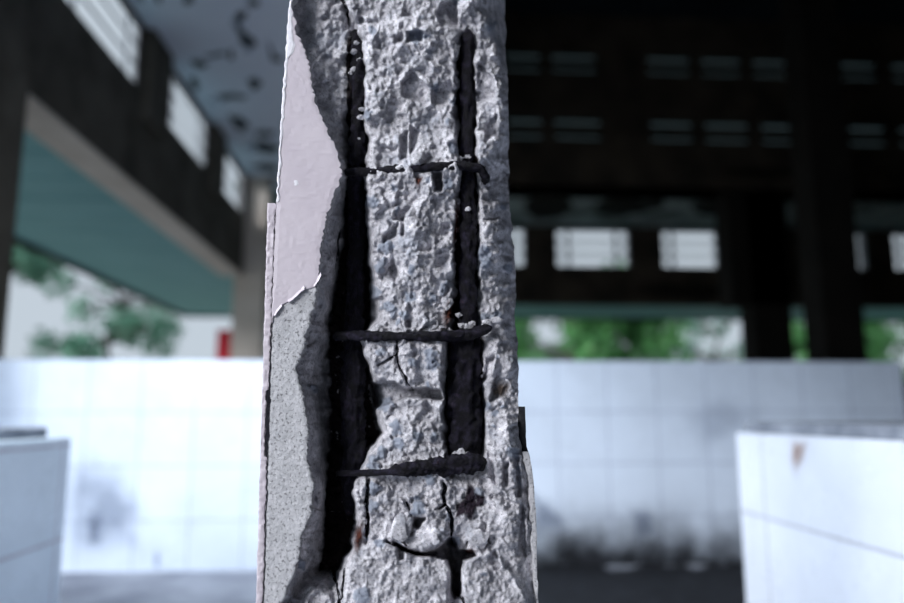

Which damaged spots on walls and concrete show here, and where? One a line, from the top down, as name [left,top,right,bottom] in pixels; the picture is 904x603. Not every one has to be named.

crack [340,0,349,25]
peeling [524,194,574,220]
spalling [228,0,536,603]
crack [382,341,413,389]
crack [364,478,430,556]
crack [440,482,489,548]